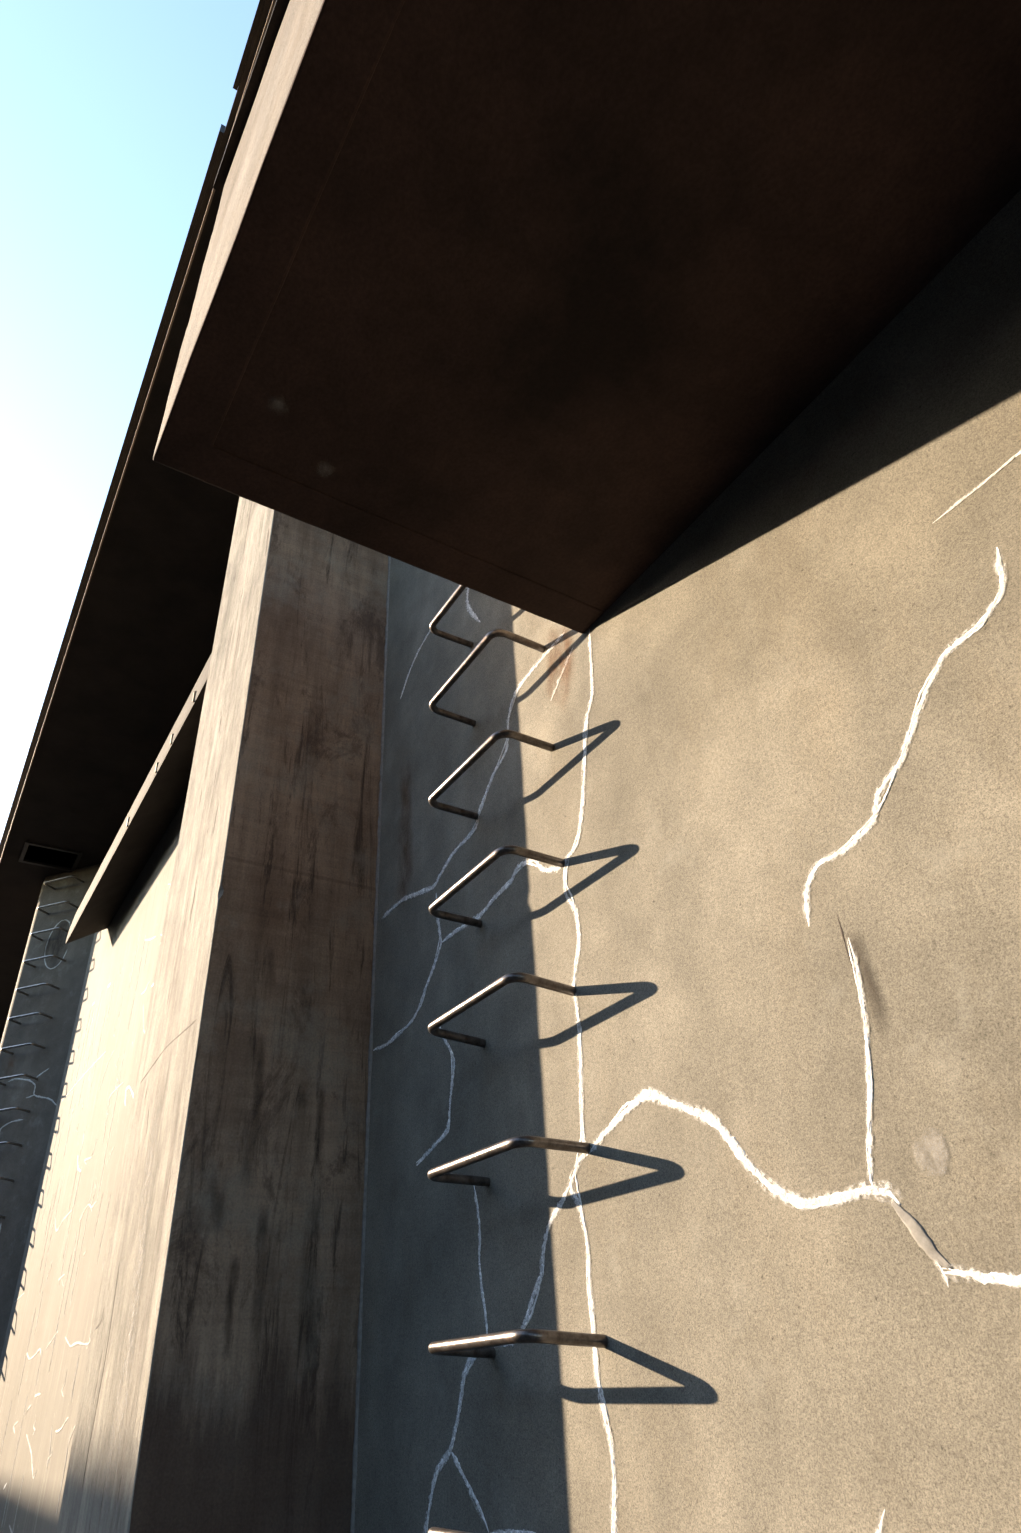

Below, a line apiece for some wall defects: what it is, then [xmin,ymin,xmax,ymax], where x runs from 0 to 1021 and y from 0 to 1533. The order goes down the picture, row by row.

crack [933,450,1021,523]
crack [0,934,197,1533]
crack [373,547,1006,1533]
crack [935,1261,1021,1287]